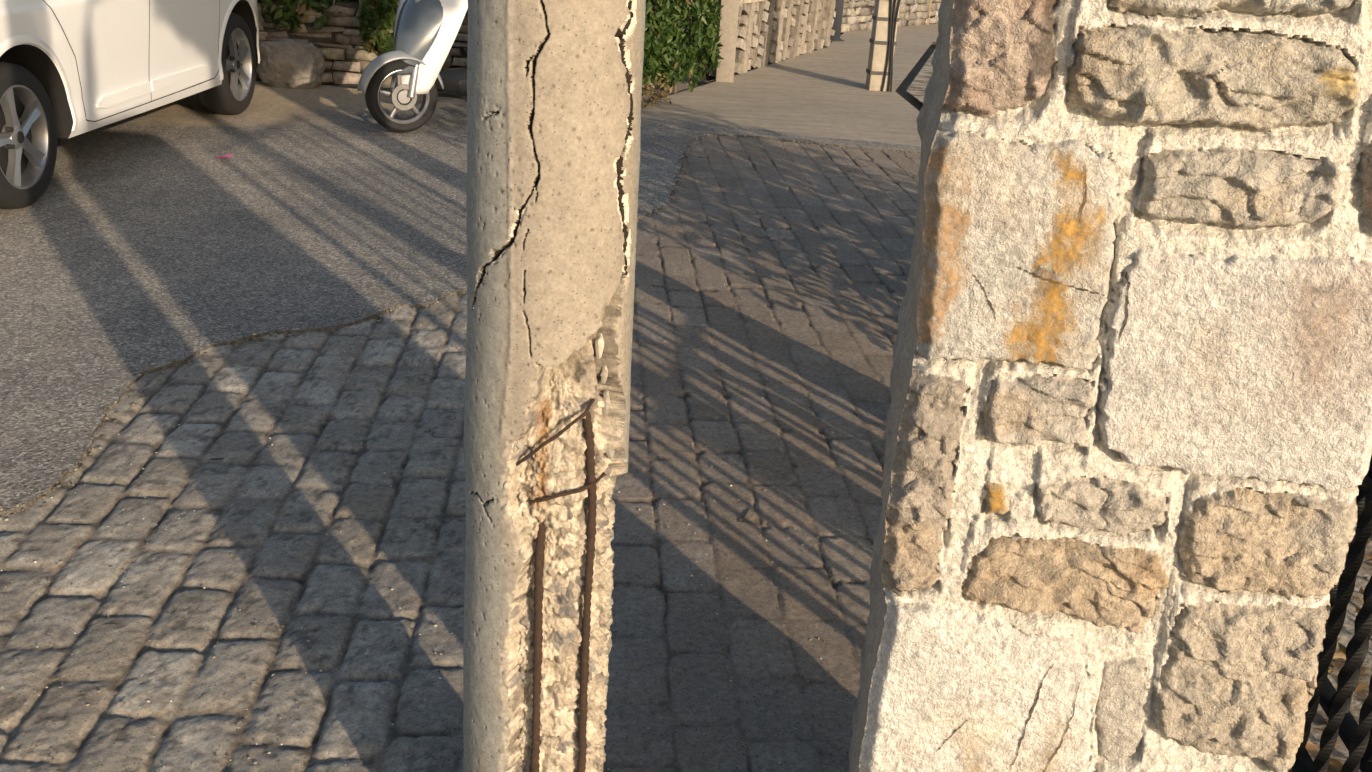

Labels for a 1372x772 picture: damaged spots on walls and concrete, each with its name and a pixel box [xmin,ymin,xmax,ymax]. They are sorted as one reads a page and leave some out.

corrosion [927,148,949,172]
corrosion [1057,155,1085,183]
corrosion [917,202,969,342]
corrosion [1006,209,1104,363]
crack [1011,664,1079,772]